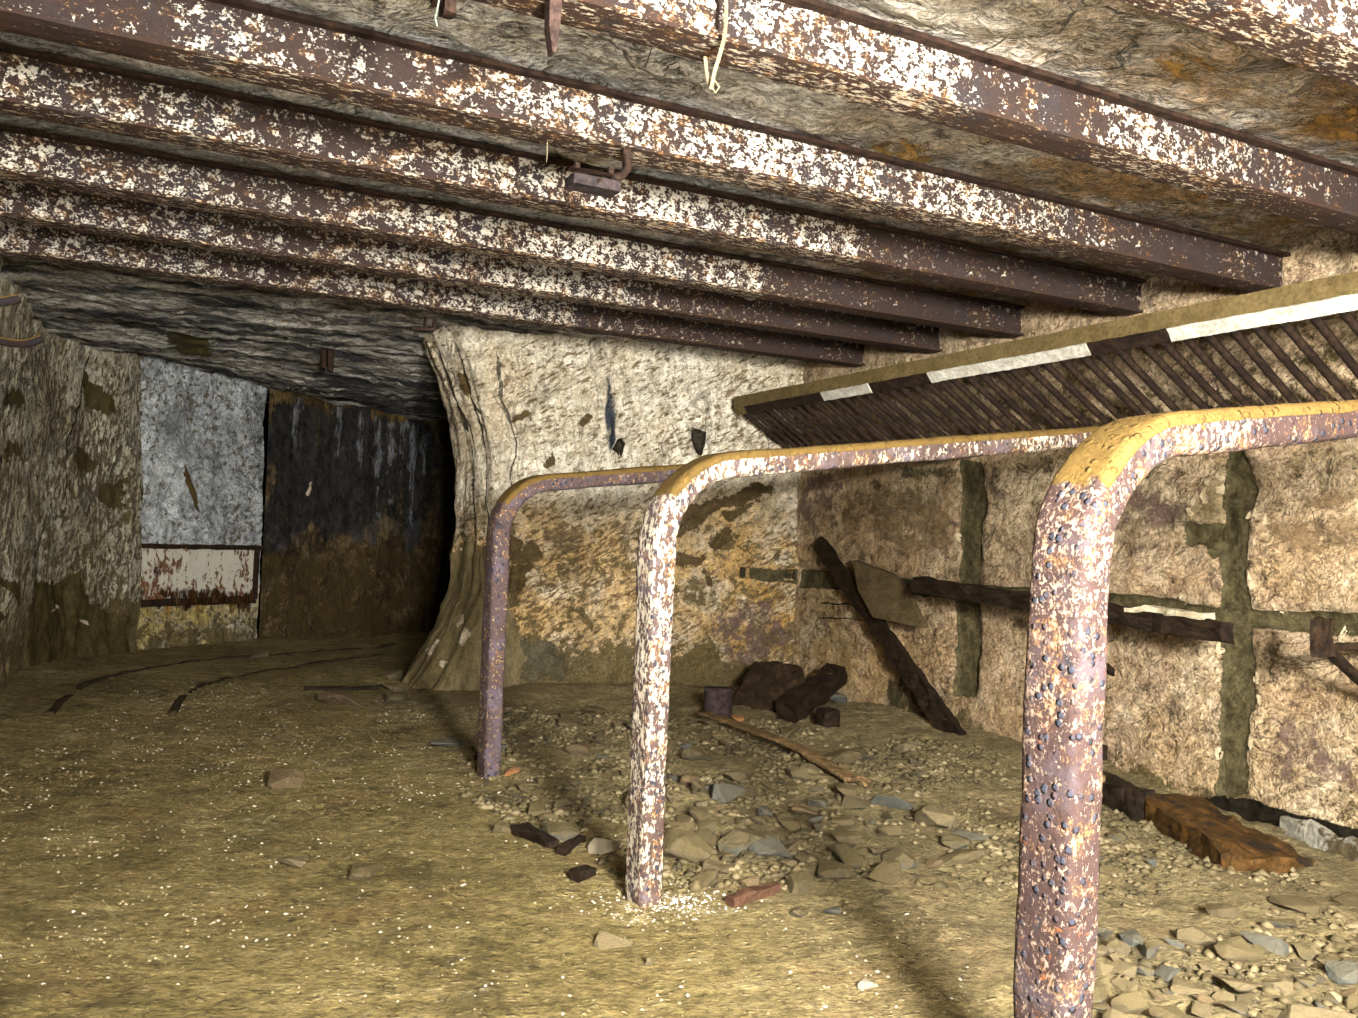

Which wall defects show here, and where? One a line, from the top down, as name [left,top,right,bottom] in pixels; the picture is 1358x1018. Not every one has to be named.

water stain [291,397,304,443]
water stain [335,405,428,527]
rust [141,587,254,616]